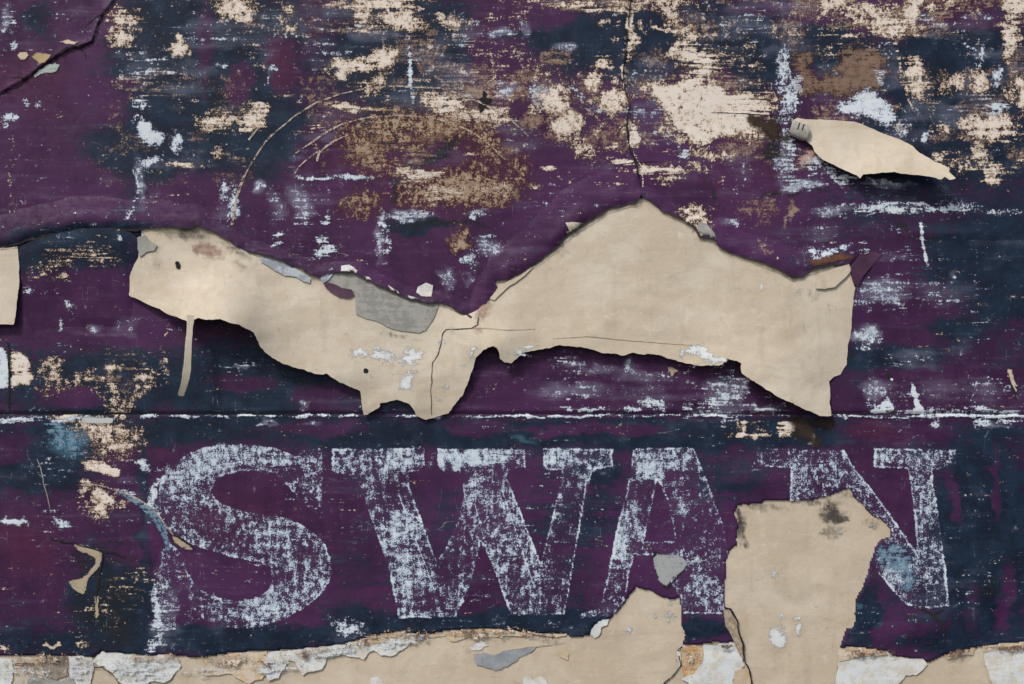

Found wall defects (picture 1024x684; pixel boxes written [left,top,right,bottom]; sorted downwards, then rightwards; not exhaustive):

crack [0,0,113,95]
crack [614,1,655,198]
peeling [789,0,1024,187]
peeling [0,0,882,420]
peeling [0,488,1024,684]